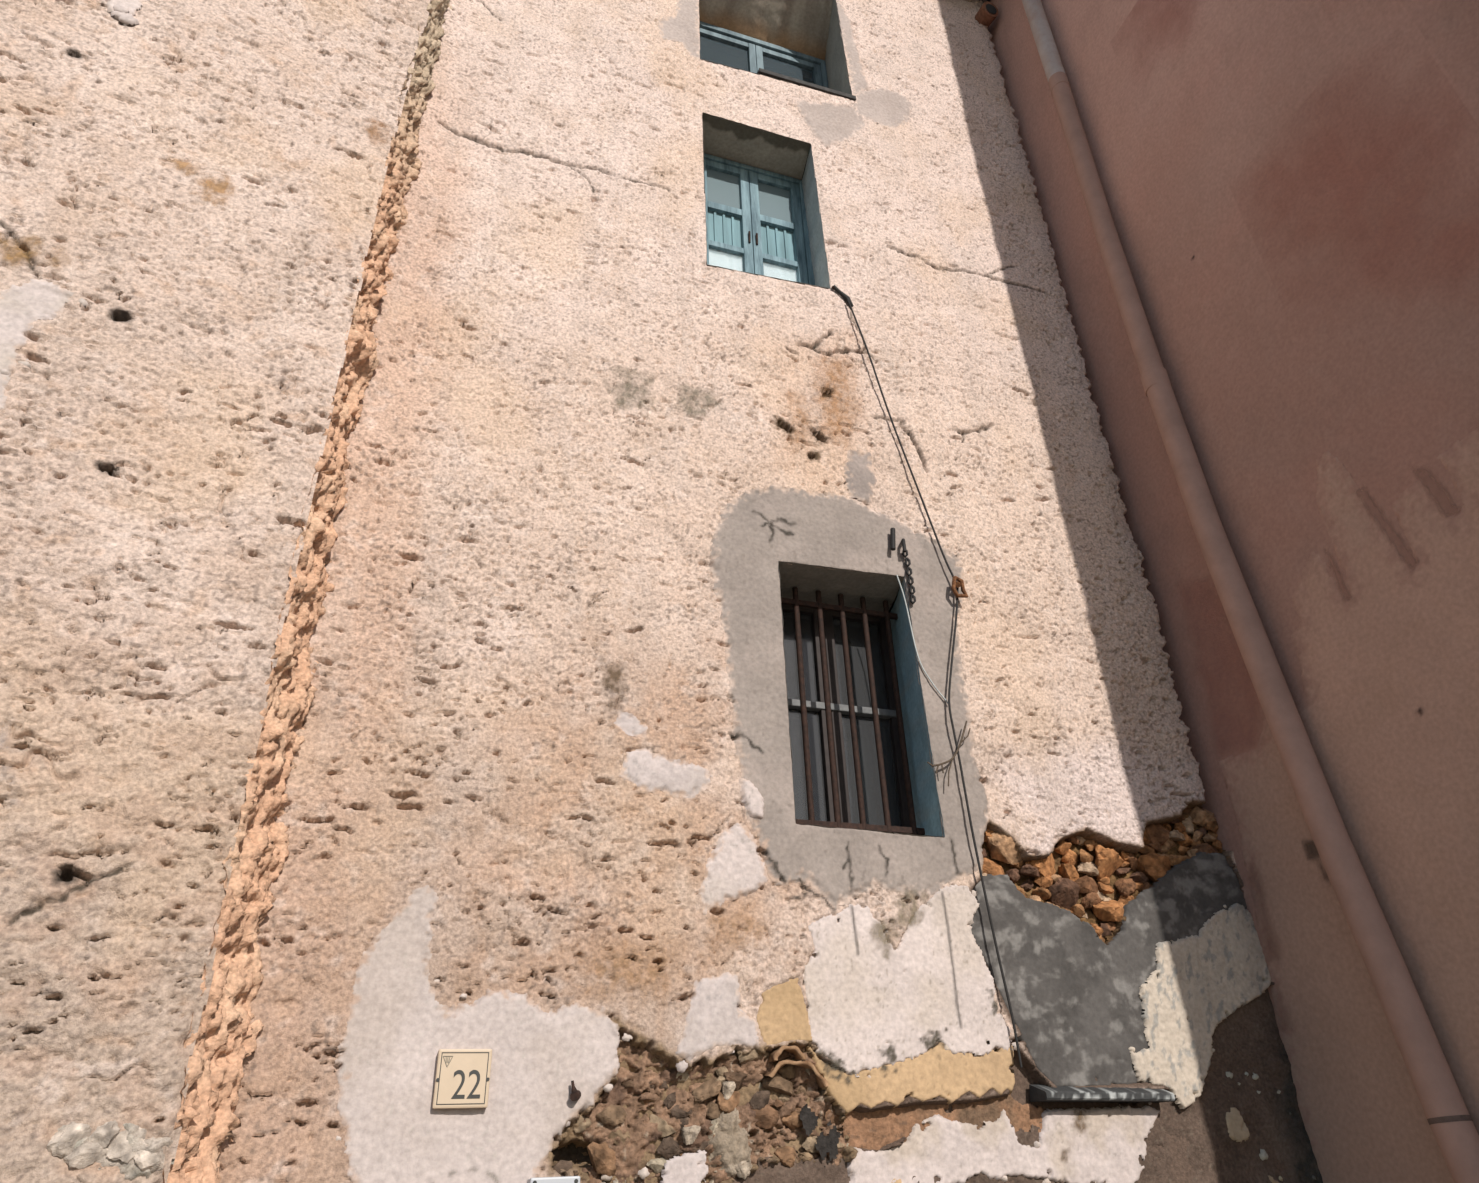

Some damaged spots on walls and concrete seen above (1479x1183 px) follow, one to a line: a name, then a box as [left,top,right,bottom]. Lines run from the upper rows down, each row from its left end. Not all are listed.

flaking render [698,778,769,915]
flaking render [334,806,1319,1183]